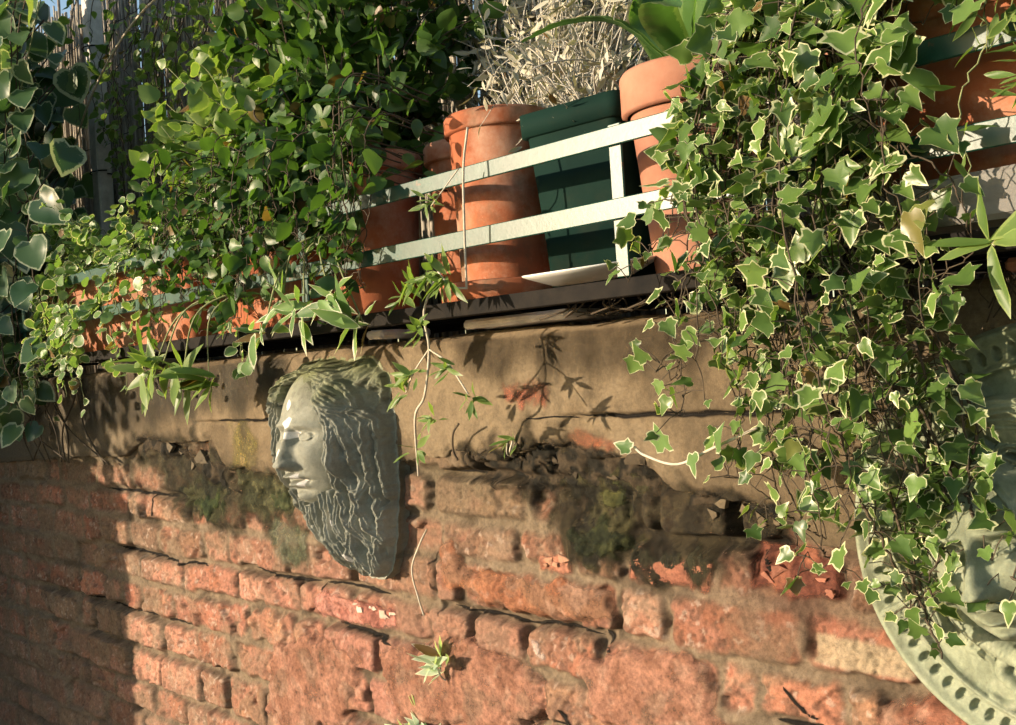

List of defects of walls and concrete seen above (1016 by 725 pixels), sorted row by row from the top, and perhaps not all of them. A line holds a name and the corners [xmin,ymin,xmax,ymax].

leakage [132,428,280,535]
leakage [456,419,539,465]
leakage [491,436,596,567]
crack [526,409,788,420]
spalling [629,541,713,593]
leakage [593,476,788,590]
spalling [689,490,844,600]